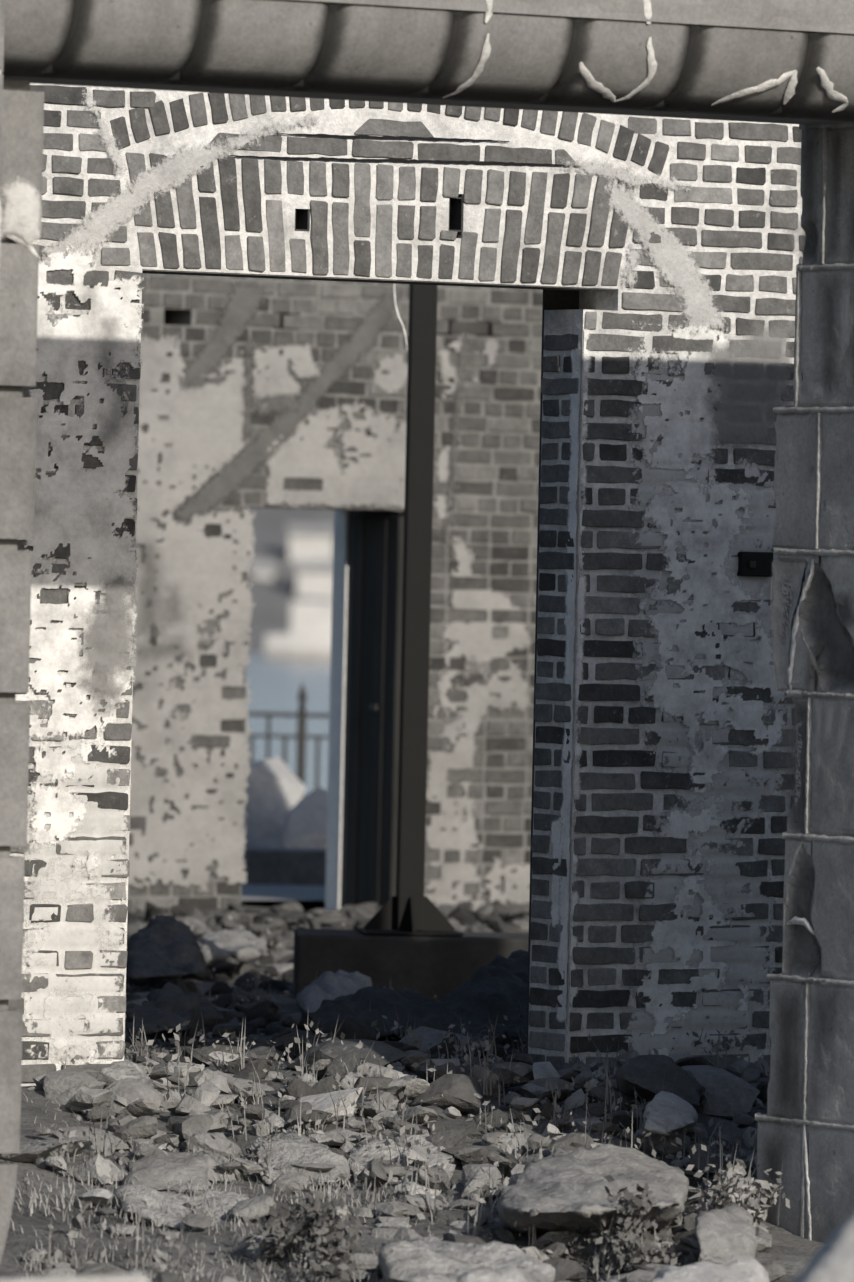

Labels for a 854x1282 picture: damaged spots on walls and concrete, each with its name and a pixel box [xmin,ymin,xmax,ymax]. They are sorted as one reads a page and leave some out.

crack [579,0,657,102]
crack [712,67,849,113]
peeling [438,332,500,399]
peeling [433,445,452,525]
peeling [19,245,408,1065]
peeling [424,536,531,911]
peeling [621,321,854,1063]
crack [787,559,814,690]
crack [789,841,803,876]
crack [786,916,814,935]